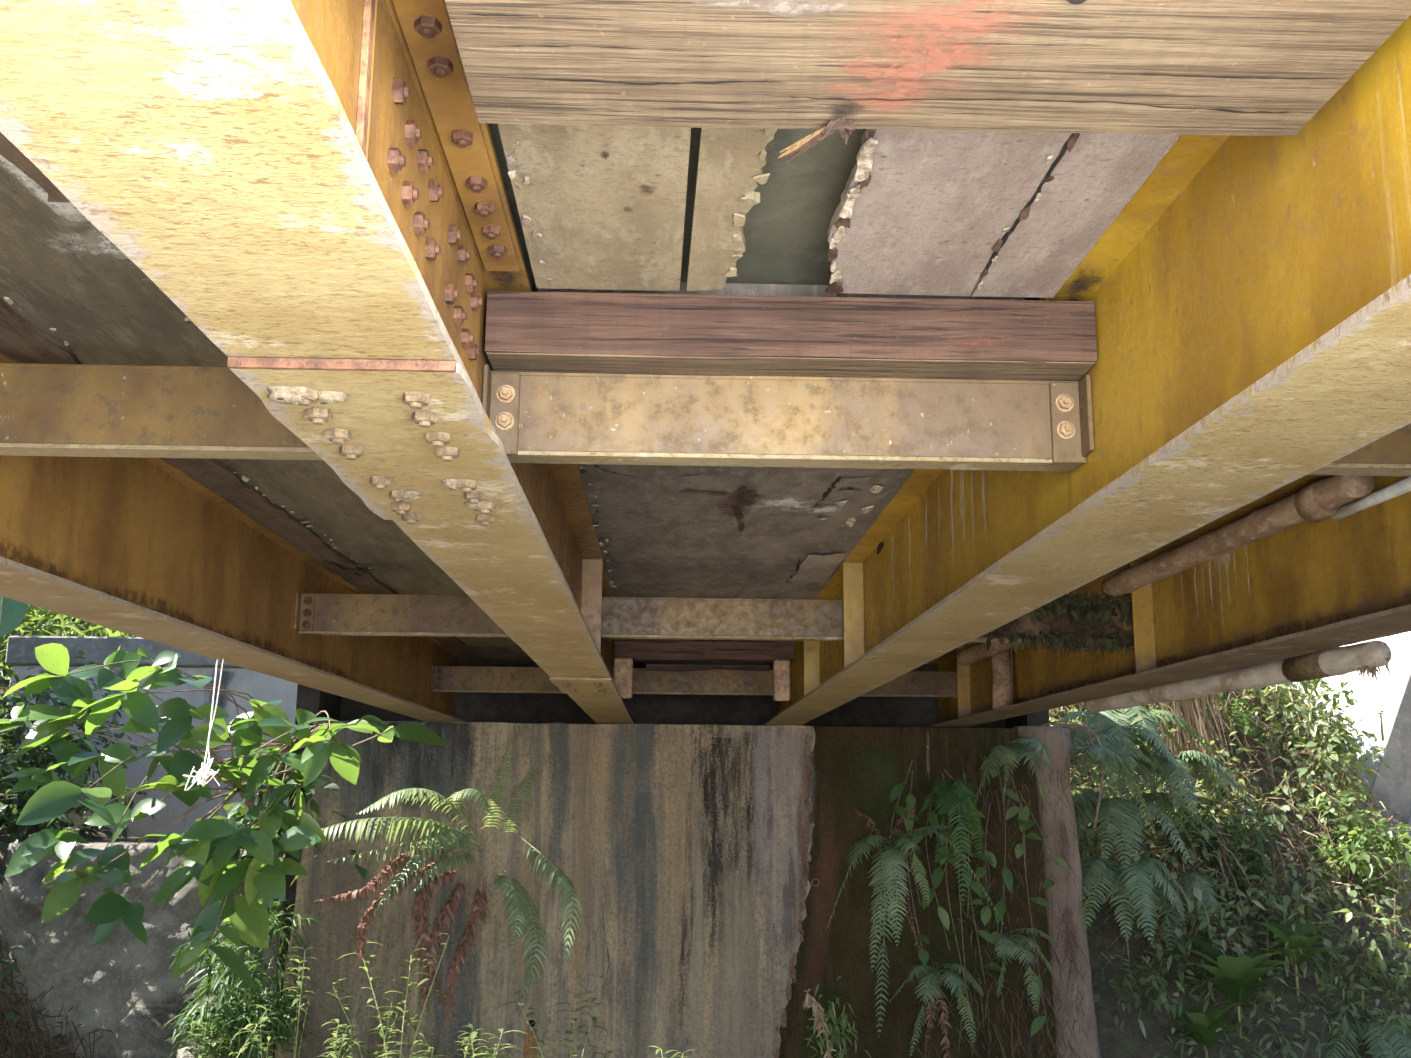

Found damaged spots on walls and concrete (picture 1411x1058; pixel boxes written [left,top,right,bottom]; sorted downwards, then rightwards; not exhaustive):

water stain [0,155,127,257]
peeling [725,197,748,277]
peeling [753,129,778,185]
peeling [825,129,878,297]
crack [467,14,1346,296]
spalling [786,552,846,584]
water stain [302,853,356,1058]
water stain [366,881,476,1058]
water stain [549,723,568,882]
water stain [609,723,656,1015]
water stain [679,724,812,1058]